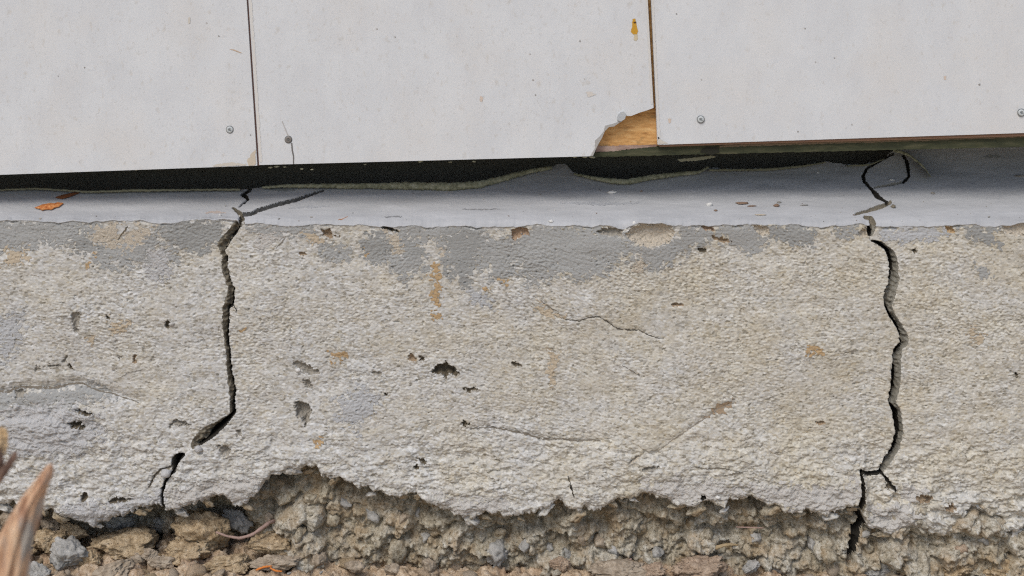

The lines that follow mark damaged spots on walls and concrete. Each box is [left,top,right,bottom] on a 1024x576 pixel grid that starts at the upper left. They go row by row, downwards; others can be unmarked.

crack [149,190,324,509]
crack [847,153,911,555]
spalling [628,455,660,473]
spalling [37,508,119,539]
spalling [109,465,1024,576]